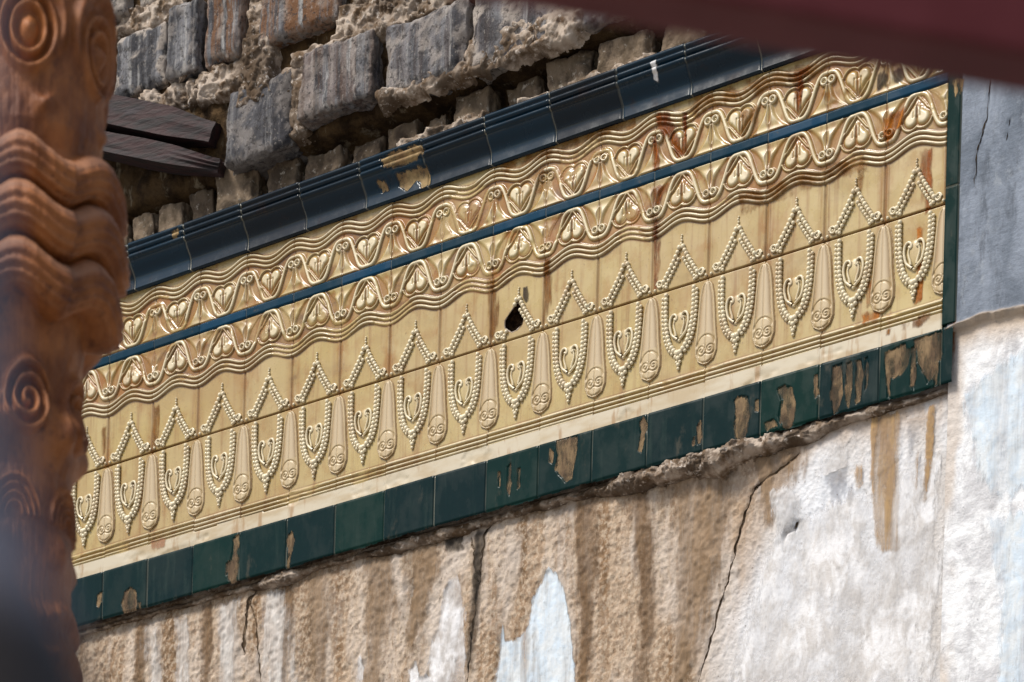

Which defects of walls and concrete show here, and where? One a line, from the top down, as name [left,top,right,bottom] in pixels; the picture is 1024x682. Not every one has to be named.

crack [974,88,1010,179]
spalling [377,144,431,193]
rust [654,184,668,204]
spalling [506,287,528,332]
spalling [734,396,759,439]
spalling [814,361,868,414]
spalling [885,332,942,395]
spalling [549,437,577,482]
crack [698,455,798,682]
peeling [728,452,942,682]
crack [467,527,490,680]
crack [241,591,261,680]